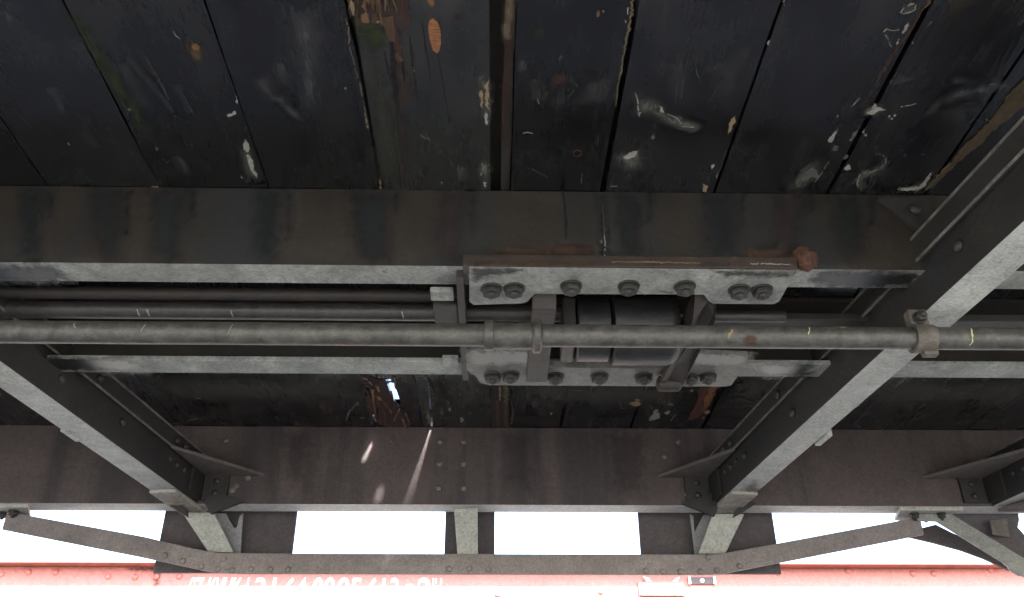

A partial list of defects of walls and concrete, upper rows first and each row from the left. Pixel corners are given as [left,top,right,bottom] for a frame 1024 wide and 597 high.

peeling [427,0,441,53]
peeling [479,80,489,125]
peeling [635,93,698,130]
peeling [241,140,257,178]
peeling [796,160,828,188]
peeling [828,99,914,191]
peeling [900,173,931,191]
corrosion [750,246,819,272]